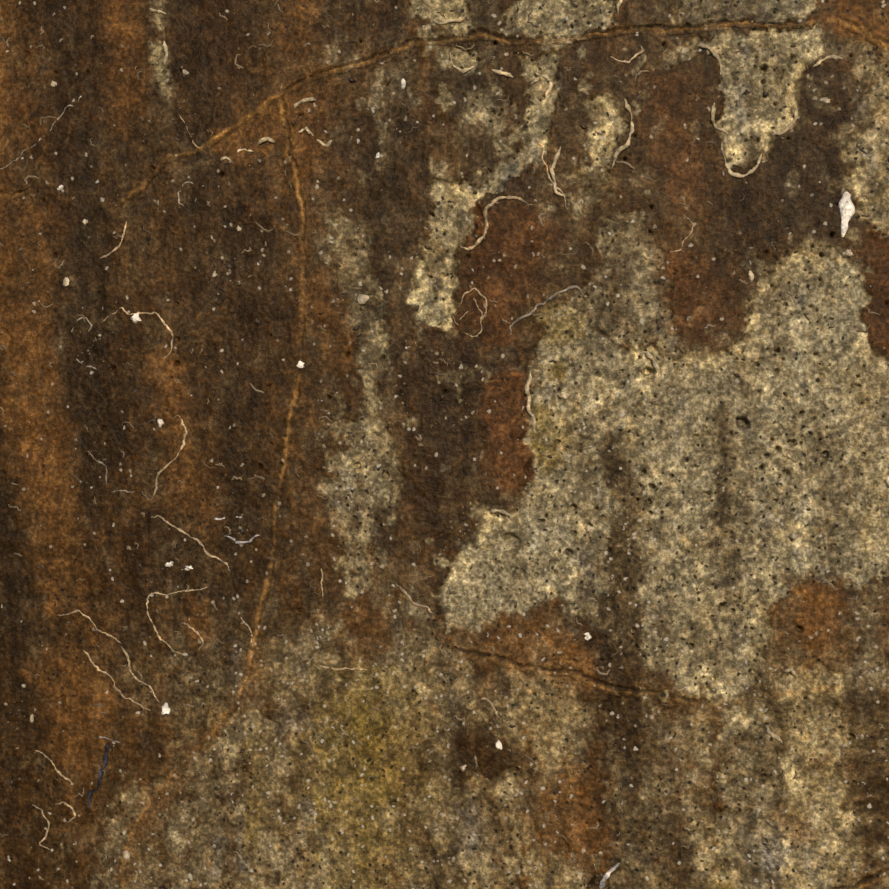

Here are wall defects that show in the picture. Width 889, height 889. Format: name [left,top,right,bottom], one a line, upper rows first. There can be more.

rust [0,0,88,625]
rust [144,339,225,557]
rust [422,179,576,518]
crack [114,11,889,362]
rust [615,35,754,367]
rust [854,220,889,373]
rust [34,638,137,847]
crack [119,361,304,889]
crack [446,646,843,709]
rust [752,559,889,689]
crack [585,869,621,889]
crack [818,865,889,889]